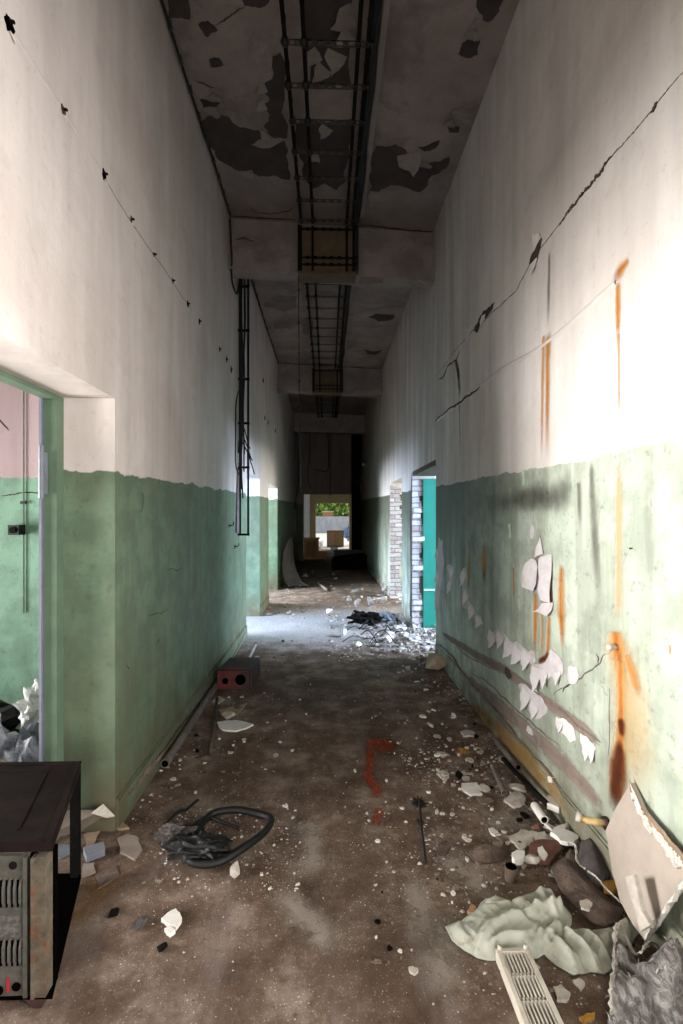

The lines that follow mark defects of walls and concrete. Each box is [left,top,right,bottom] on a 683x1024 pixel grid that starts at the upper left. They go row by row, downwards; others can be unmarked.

crack [215,7,244,26]
peeling [459,0,503,58]
peeling [200,53,291,182]
peeling [367,109,460,207]
crack [107,182,191,309]
crack [439,72,683,380]
rust [541,337,550,427]
rust [615,259,628,405]
spalling [390,475,601,806]
rust [533,568,564,663]
crack [553,651,611,755]
rust [606,633,640,806]